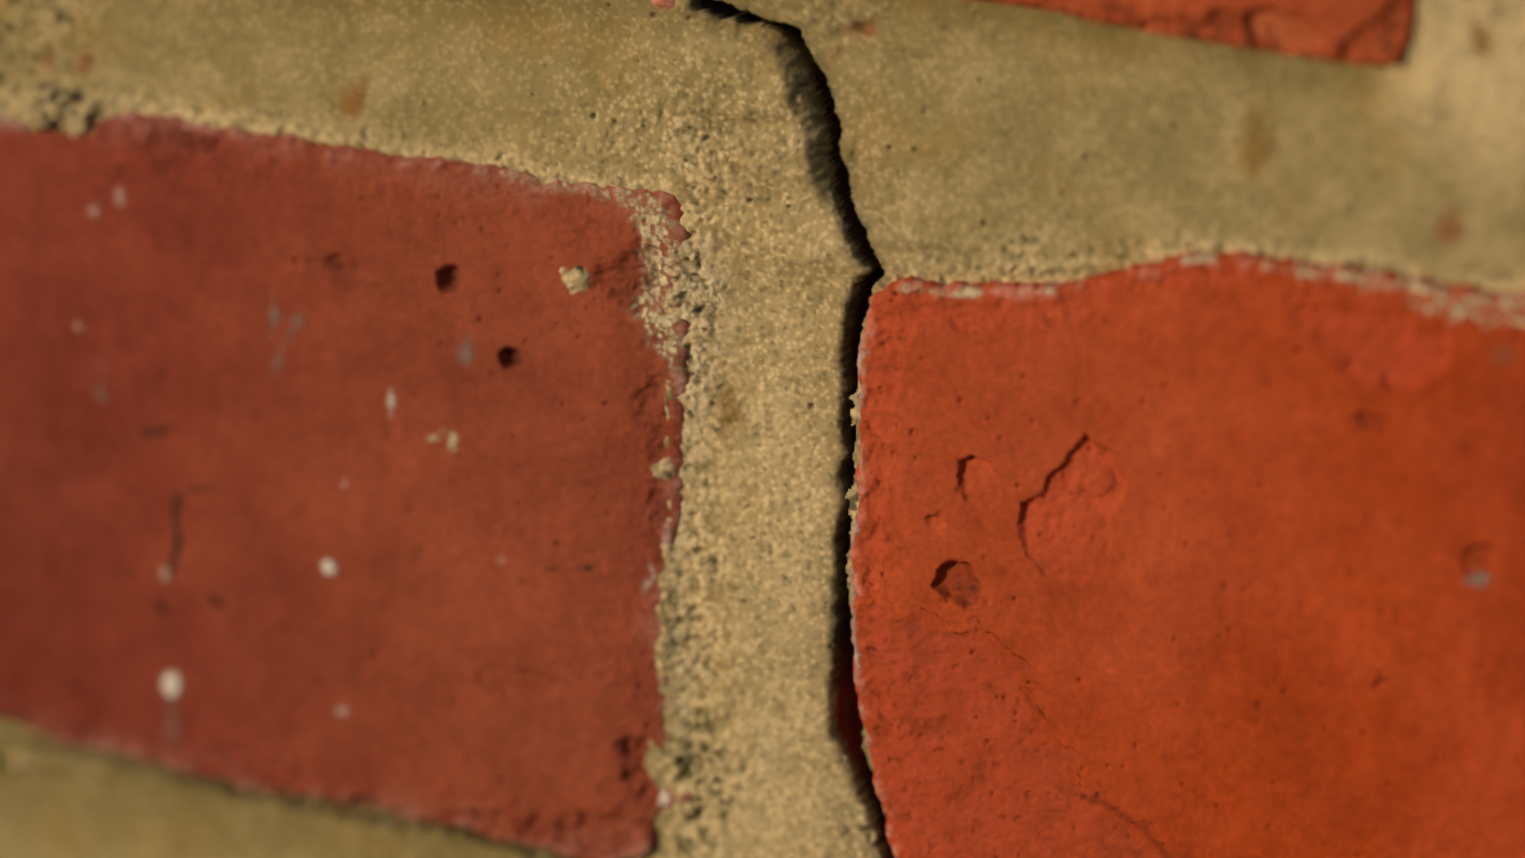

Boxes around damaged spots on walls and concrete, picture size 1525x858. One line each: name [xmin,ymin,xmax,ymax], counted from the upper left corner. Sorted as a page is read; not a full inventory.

crack [698,0,895,858]
spalling [853,260,1279,858]
peeling [1456,539,1500,589]